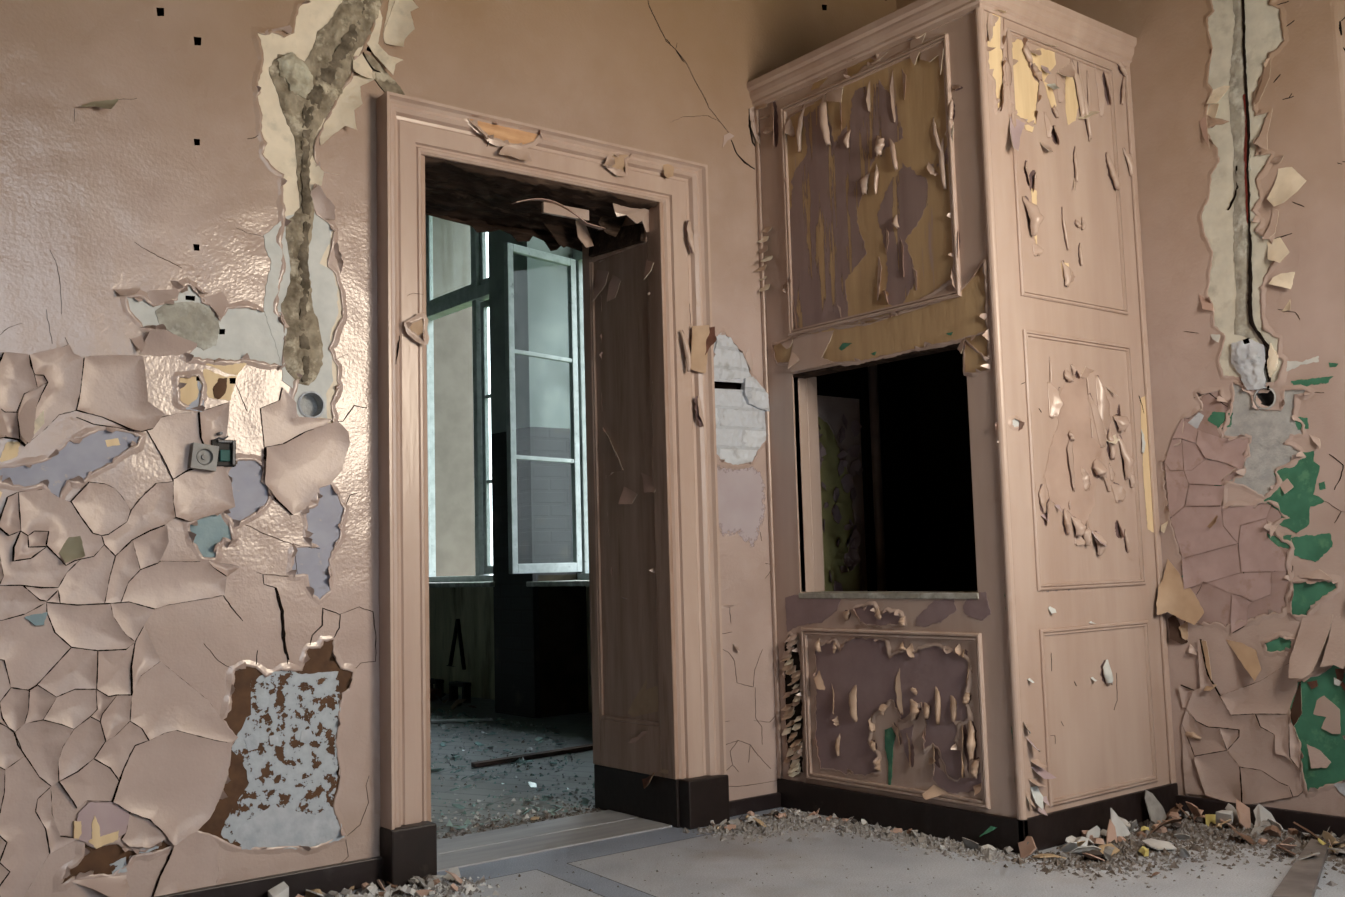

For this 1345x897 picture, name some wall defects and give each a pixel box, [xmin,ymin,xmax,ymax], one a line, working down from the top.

peeling [464,115,543,162]
crack [648,1,755,169]
peeling [748,33,992,377]
peeling [985,9,1128,257]
peeling [396,313,429,361]
peeling [681,304,770,470]
peeling [994,415,1025,448]
peeling [1018,0,1345,862]
peeling [780,413,1006,800]
peeling [1011,722,1056,816]
peeling [268,867,463,897]